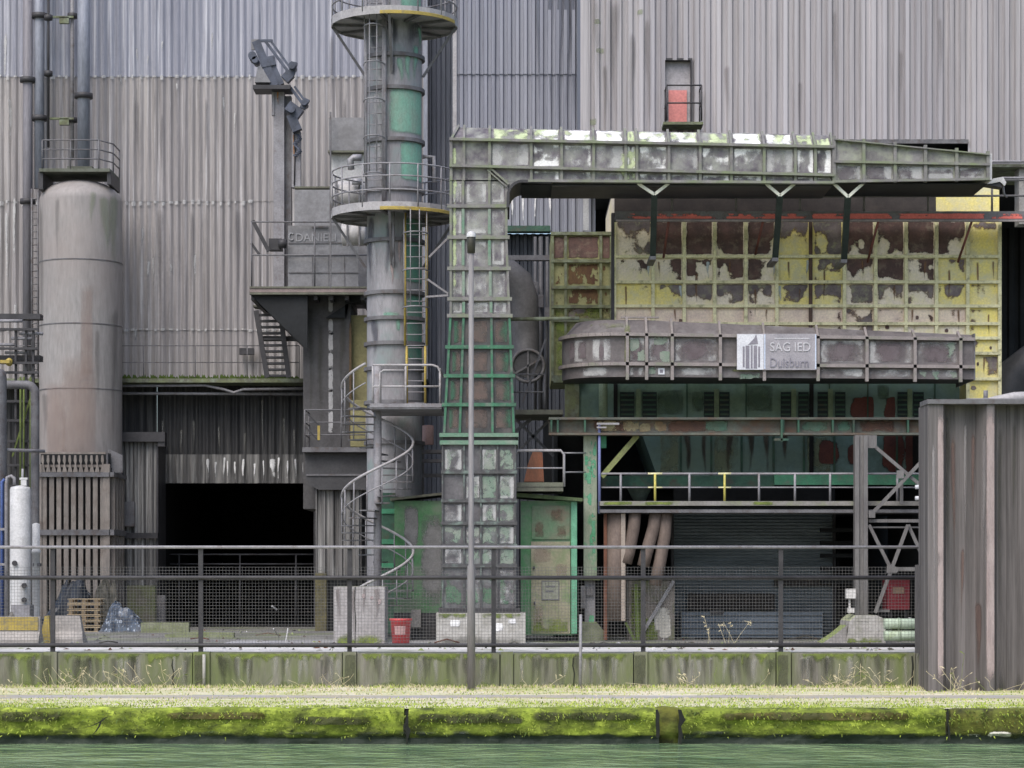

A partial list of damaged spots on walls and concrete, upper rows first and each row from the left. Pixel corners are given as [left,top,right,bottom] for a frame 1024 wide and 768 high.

peeling [617,213,1022,330]
peeling [630,337,670,374]
corrosion [860,421,894,431]
corrosion [594,420,707,467]
water stain [41,656,51,687]
water stain [194,656,202,686]
water stain [345,655,355,687]
water stain [0,712,659,744]